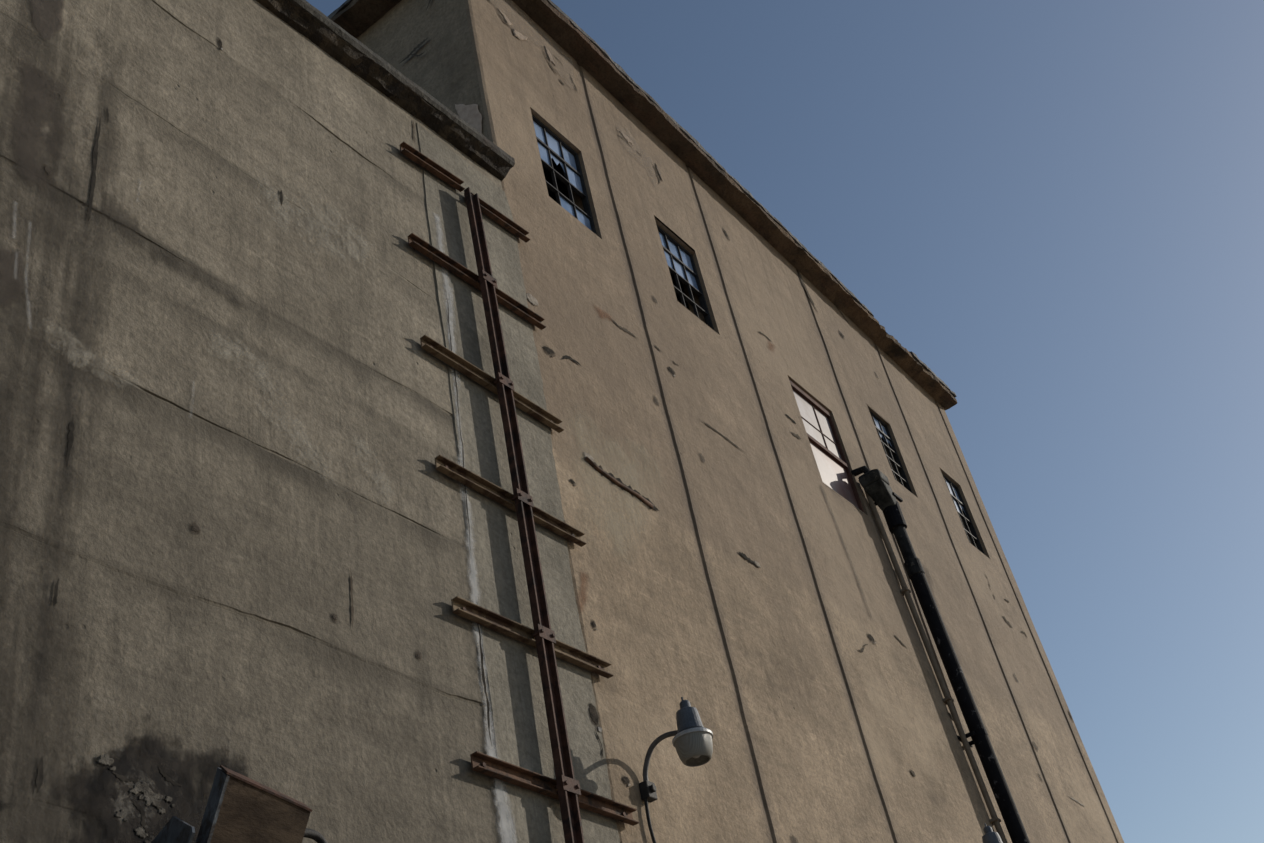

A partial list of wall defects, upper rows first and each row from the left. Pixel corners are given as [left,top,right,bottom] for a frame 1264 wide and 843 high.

peeling [455,104,482,133]
water stain [129,735,248,843]